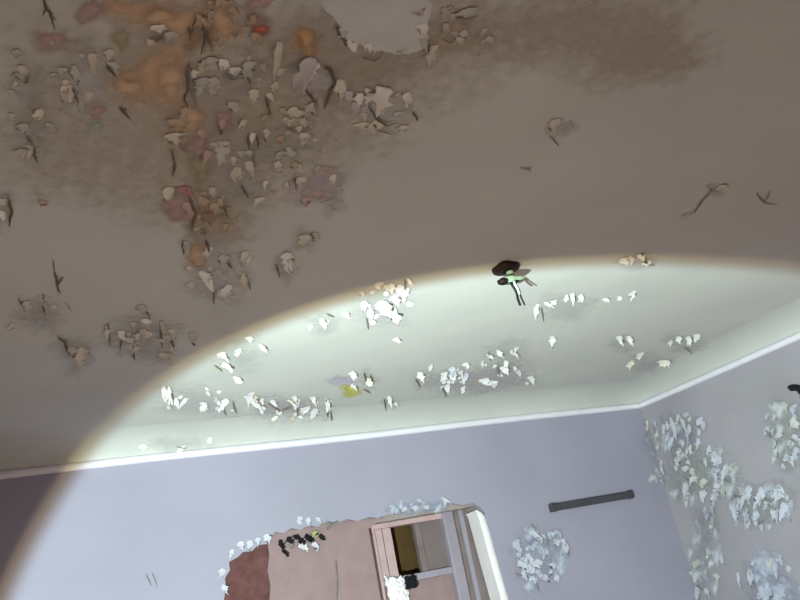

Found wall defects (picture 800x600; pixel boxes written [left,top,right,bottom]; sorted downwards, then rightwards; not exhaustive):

crack [43,0,56,30]
peeling [319,0,495,66]
damp [100,0,385,244]
peeling [187,41,418,207]
crack [690,186,718,215]
crack [53,260,63,293]
peeling [358,278,414,330]
peeling [416,346,535,398]
peeling [244,392,333,424]
peeling [763,384,800,470]
peeling [644,412,800,600]
spalling [218,516,383,600]